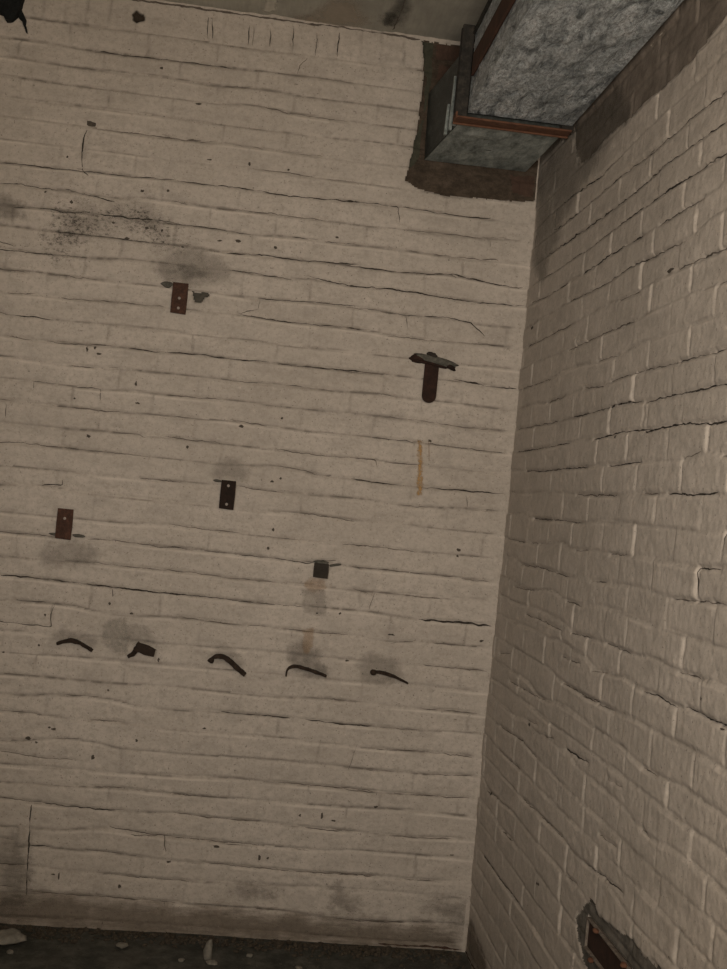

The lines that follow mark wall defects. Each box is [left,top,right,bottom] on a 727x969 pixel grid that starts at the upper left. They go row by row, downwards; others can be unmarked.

flaking render [405,40,538,202]
spalling [576,898,661,969]